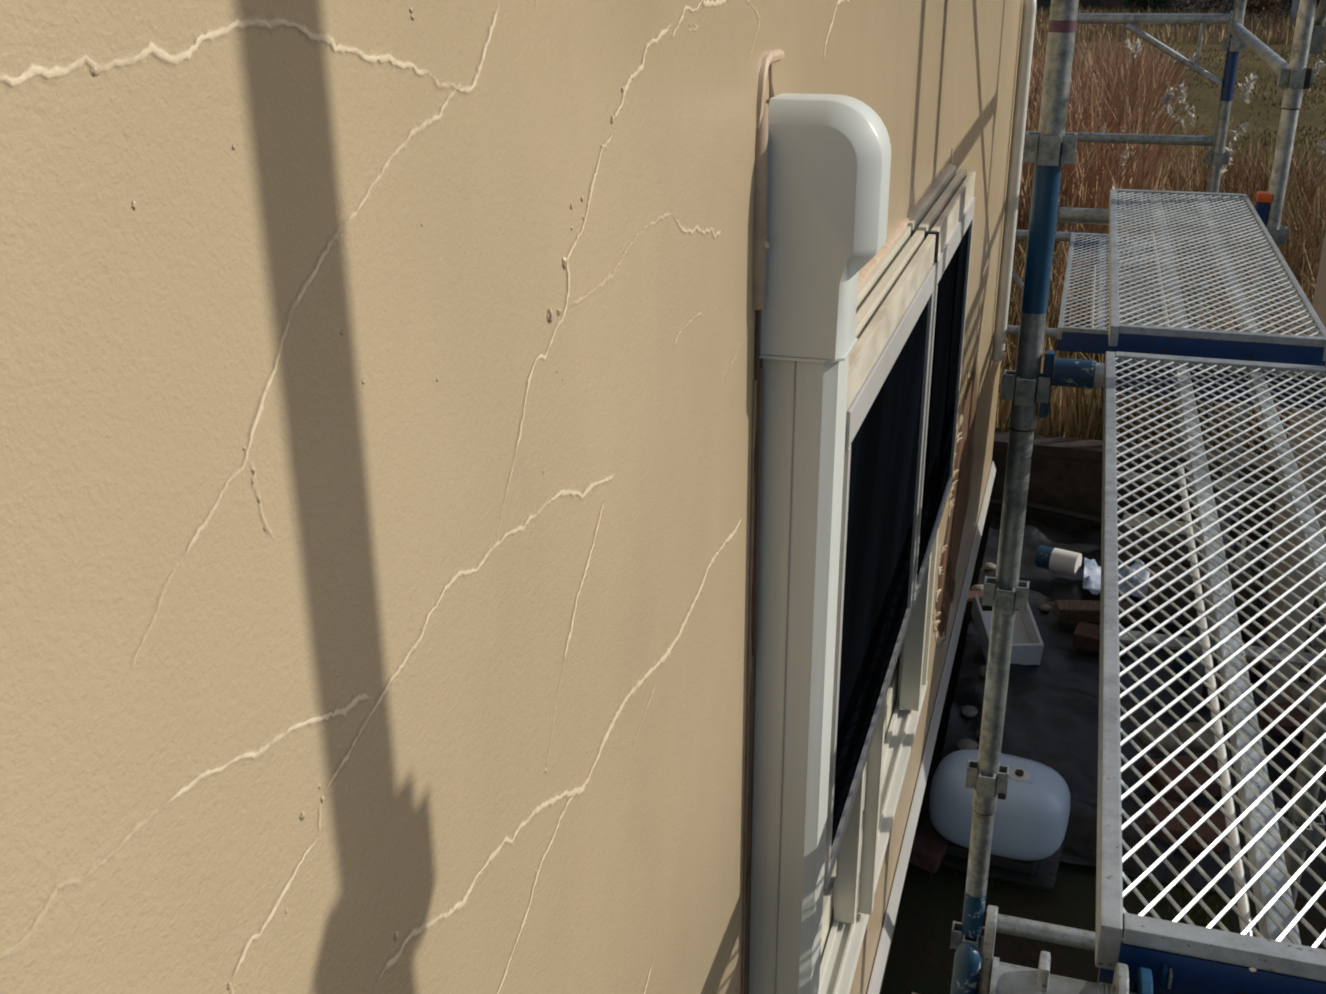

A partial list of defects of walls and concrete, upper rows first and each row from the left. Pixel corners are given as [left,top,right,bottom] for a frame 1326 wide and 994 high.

crack [0,9,498,553]
crack [2,471,616,994]
crack [380,517,742,994]
crack [507,0,760,492]
peeling [933,369,977,648]